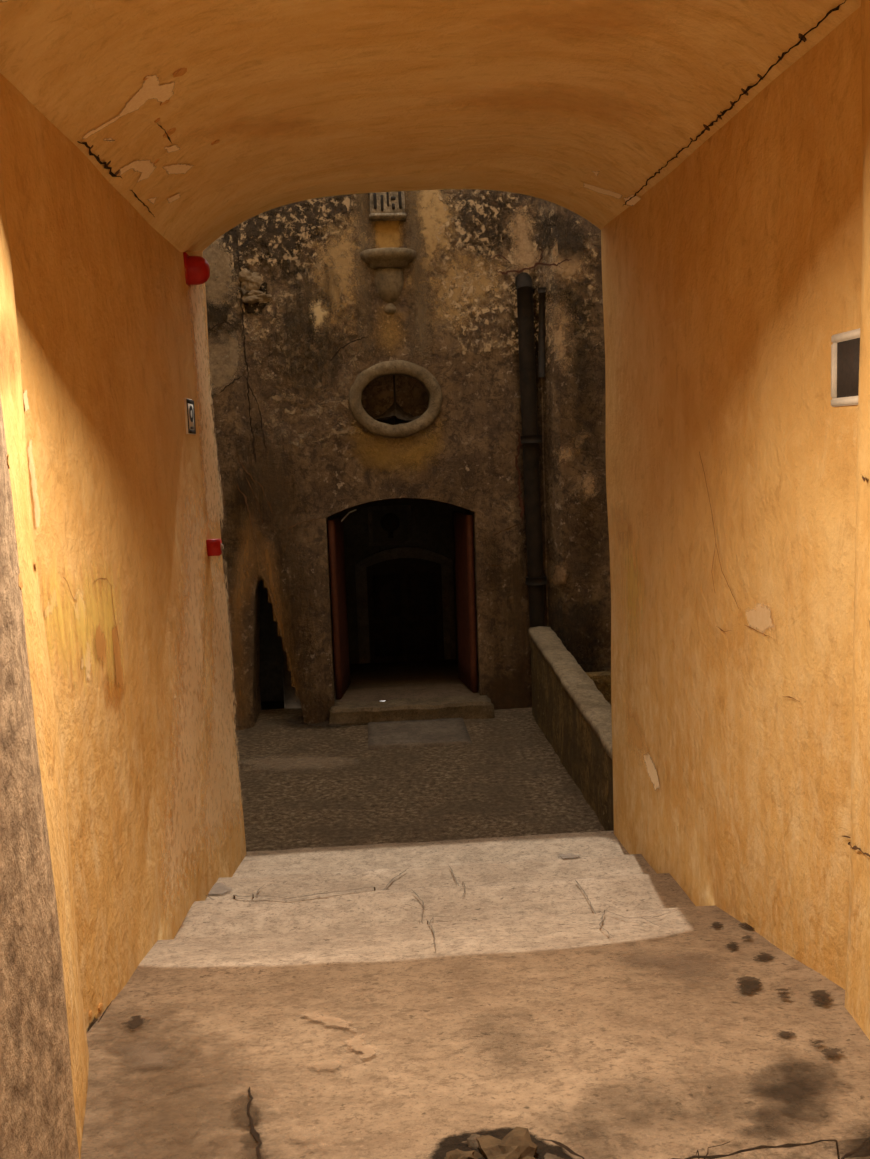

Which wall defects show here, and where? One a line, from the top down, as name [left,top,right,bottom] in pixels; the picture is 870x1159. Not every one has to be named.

peeling [83,68,192,182]
crack [623,0,846,205]
water stain [206,193,371,727]
water stain [405,189,602,710]
crack [233,1087,266,1159]
spalling [429,1127,585,1159]
crack [672,1137,870,1159]
water stain [752,1061,830,1132]